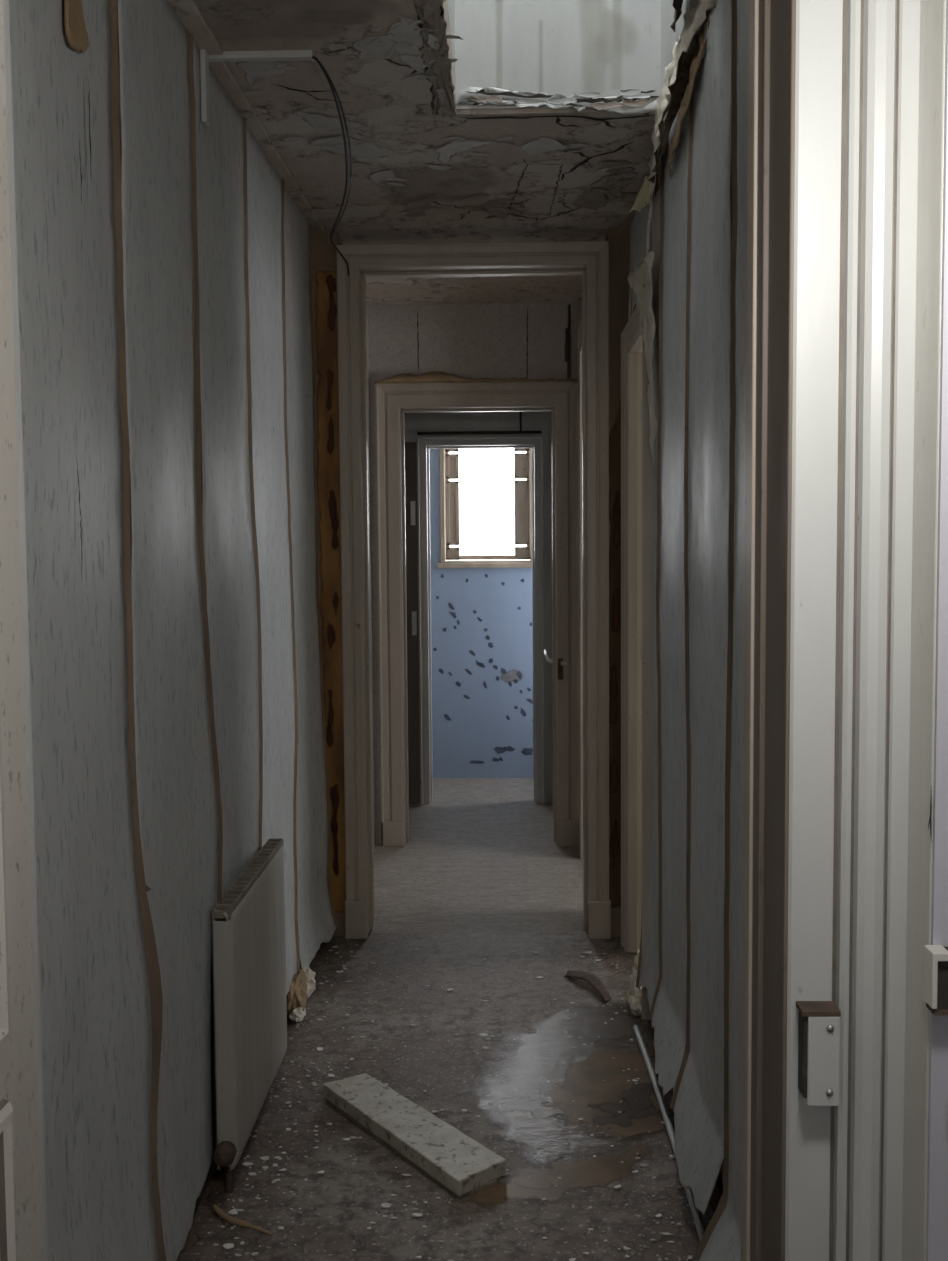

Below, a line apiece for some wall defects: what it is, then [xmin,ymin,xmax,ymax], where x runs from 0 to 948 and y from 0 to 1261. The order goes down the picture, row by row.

flaking render [387,0,659,117]
crack [272,83,351,103]
crack [385,59,433,107]
peeling [427,136,589,171]
crack [396,90,656,221]